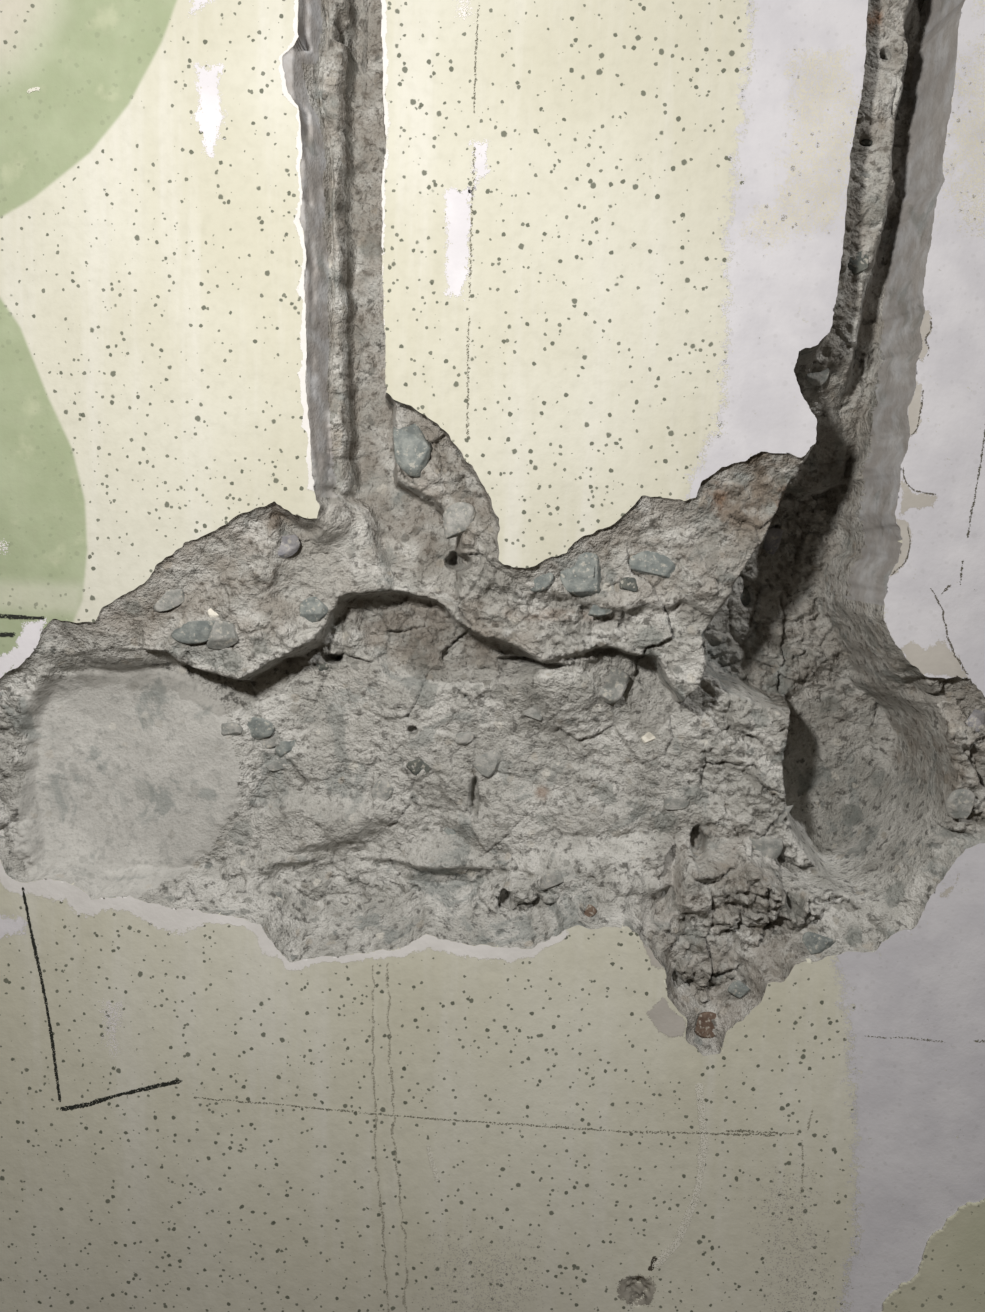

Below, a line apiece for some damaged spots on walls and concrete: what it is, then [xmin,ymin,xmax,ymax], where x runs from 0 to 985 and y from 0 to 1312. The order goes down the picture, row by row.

spalling [278,0,315,491]
spalling [381,0,391,325]
peeling [468,139,491,190]
peeling [684,0,868,500]
peeling [884,0,985,697]
spalling [0,399,985,1056]
peeling [830,843,985,1312]